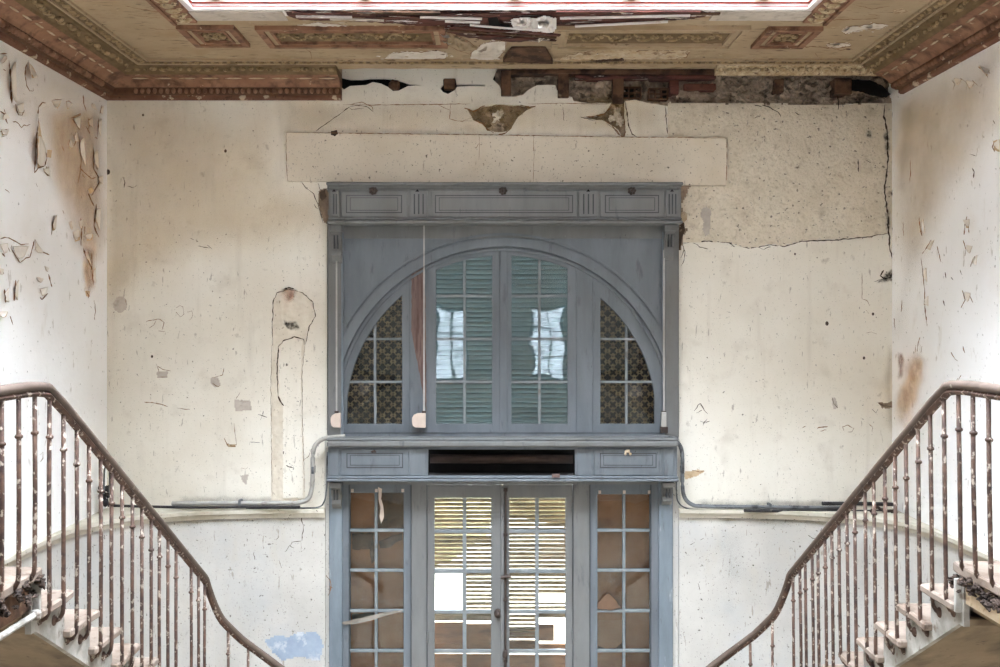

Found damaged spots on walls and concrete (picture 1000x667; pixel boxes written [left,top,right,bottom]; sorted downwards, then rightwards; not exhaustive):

flaking render [284,10,713,60]
peeling [0,53,38,137]
spalling [342,78,415,91]
flaking render [465,105,535,135]
flaking render [587,106,626,137]
crack [286,102,694,221]
peeling [34,96,104,298]
crack [681,106,911,334]
peeling [0,237,52,300]
peeling [0,280,19,324]
crack [255,287,316,495]
peeling [265,632,324,661]